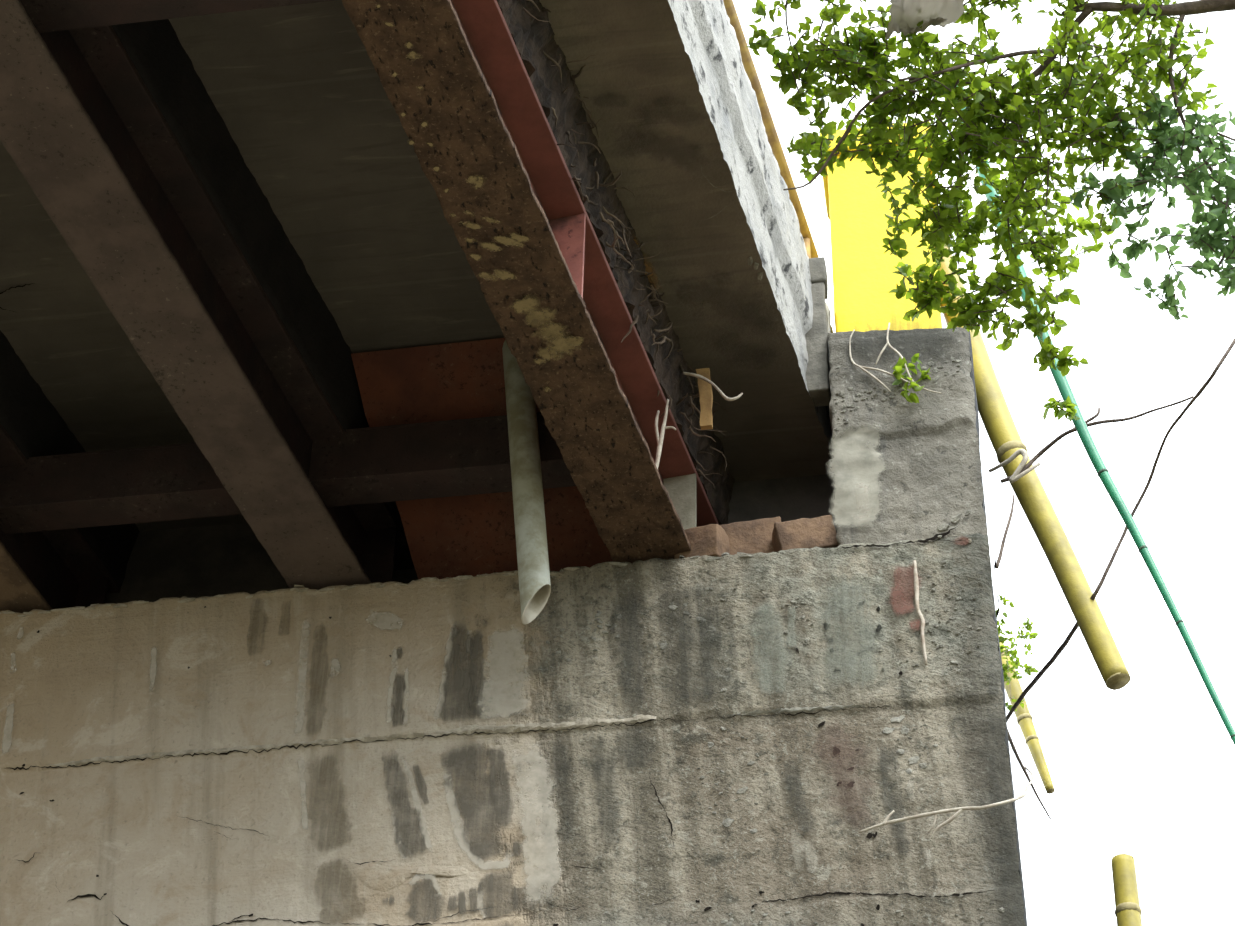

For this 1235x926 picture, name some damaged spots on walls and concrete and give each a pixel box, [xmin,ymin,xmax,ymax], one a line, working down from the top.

crack [836,525,965,550]
crack [993,545,1001,620]
leakage [387,647,409,726]
leakage [435,627,527,719]
crack [11,705,896,770]
leakage [382,757,432,857]
leakage [408,745,568,926]
crack [649,776,675,849]
crack [58,889,129,926]
crack [212,901,586,926]
crack [762,885,994,902]